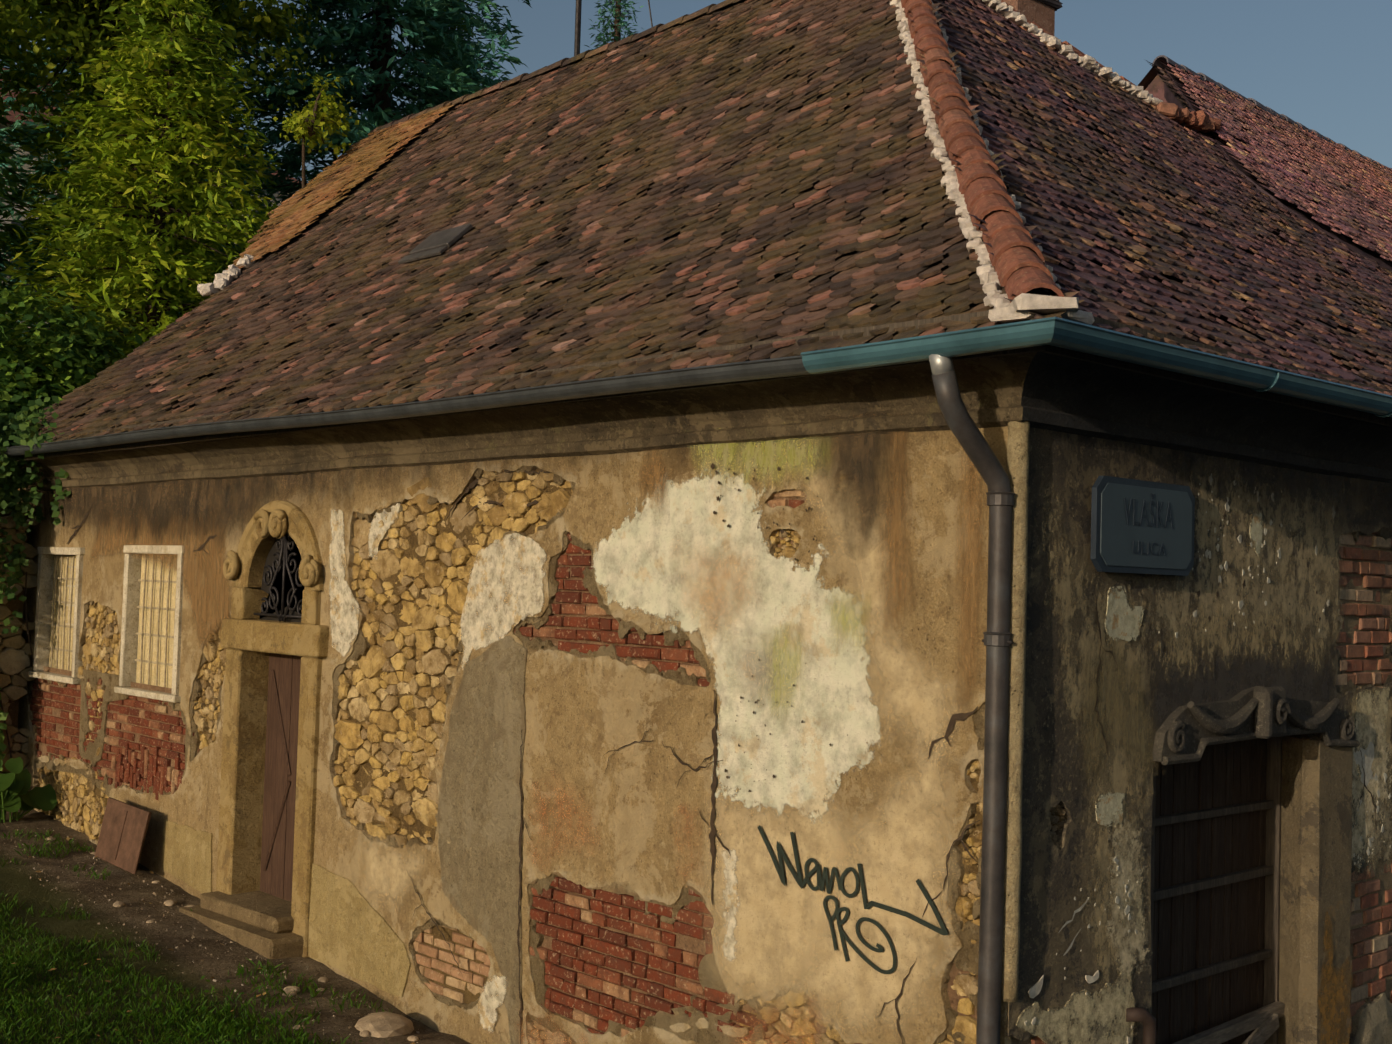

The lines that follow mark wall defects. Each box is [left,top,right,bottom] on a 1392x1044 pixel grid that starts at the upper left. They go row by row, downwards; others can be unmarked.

spalling [27,601,231,840]
peeling [329,463,985,1044]
crack [928,706,978,760]
flaking render [1011,466,1392,1044]